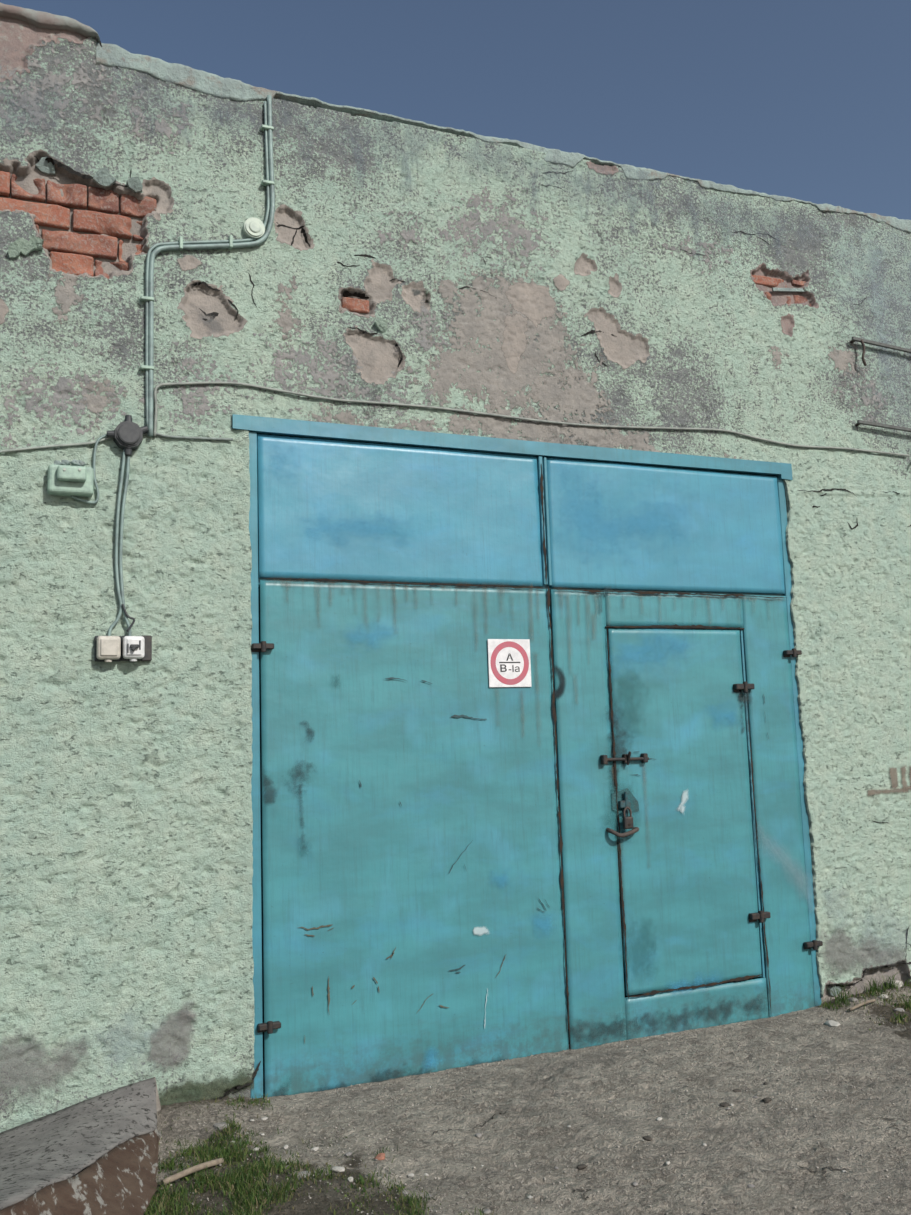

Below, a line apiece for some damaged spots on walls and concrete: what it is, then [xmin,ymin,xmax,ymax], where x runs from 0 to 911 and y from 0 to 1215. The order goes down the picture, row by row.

spalling [0,16,200,324]
peeling [0,180,681,454]
spalling [662,226,819,369]
rust [264,464,785,1038]
water stain [150,1007,194,1067]
crack [902,927,911,978]